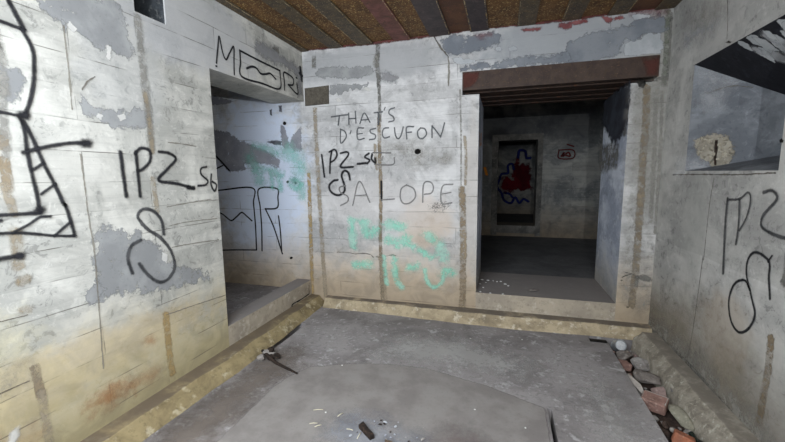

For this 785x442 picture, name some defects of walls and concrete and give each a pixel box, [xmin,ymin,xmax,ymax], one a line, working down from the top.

flaking render [37,0,136,60]
flaking render [436,0,670,71]
flaking render [79,95,153,130]
rust [459,72,479,96]
rust [459,111,467,308]
flaking render [85,224,210,305]
leakage [163,348,300,442]